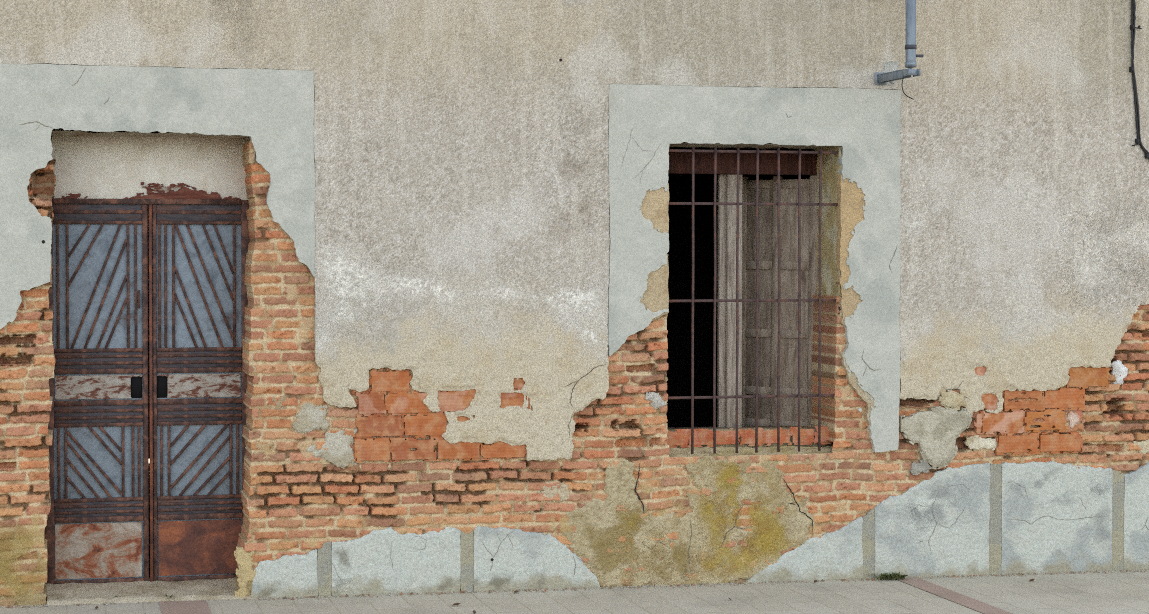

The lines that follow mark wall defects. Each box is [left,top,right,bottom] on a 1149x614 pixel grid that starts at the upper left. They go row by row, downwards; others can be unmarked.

flaking render [27,159,88,221]
flaking render [0,267,56,606]
flaking render [234,139,1149,597]